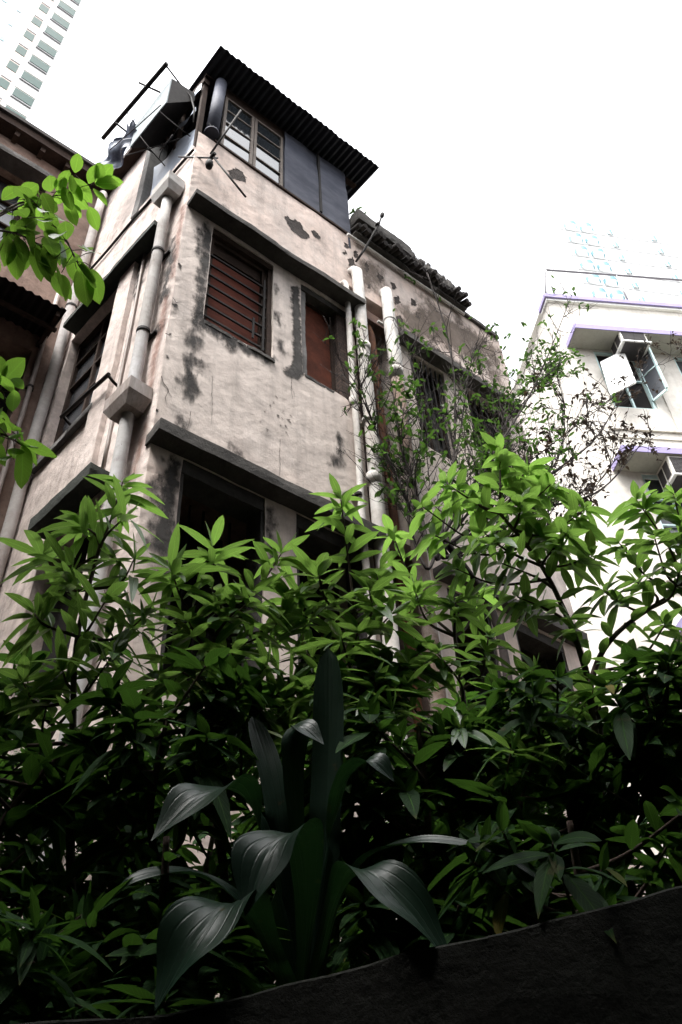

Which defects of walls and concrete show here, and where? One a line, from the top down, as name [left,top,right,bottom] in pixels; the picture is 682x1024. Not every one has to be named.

spalling [228,167,246,182]
spalling [285,216,321,239]
damp [175,223,284,401]
damp [330,434,343,466]
damp [145,455,182,574]